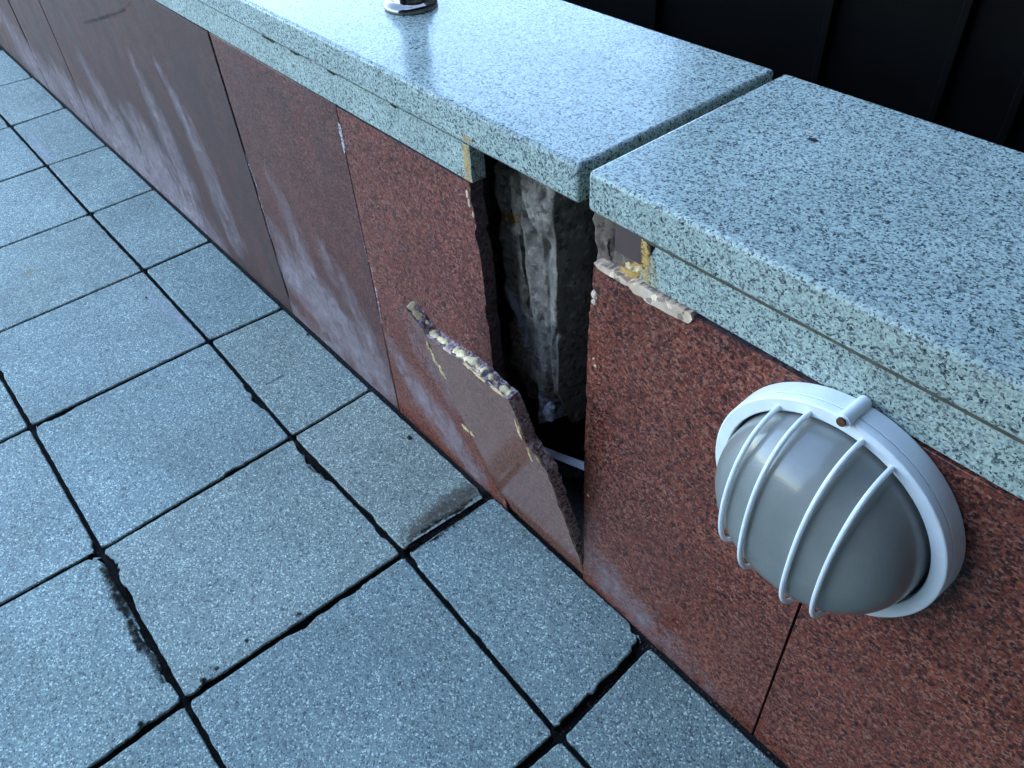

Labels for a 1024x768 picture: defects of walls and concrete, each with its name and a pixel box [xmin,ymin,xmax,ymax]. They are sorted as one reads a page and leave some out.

water stain [69,91,207,234]
water stain [285,264,385,390]
spalling [493,161,699,424]
spalling [557,460,589,497]